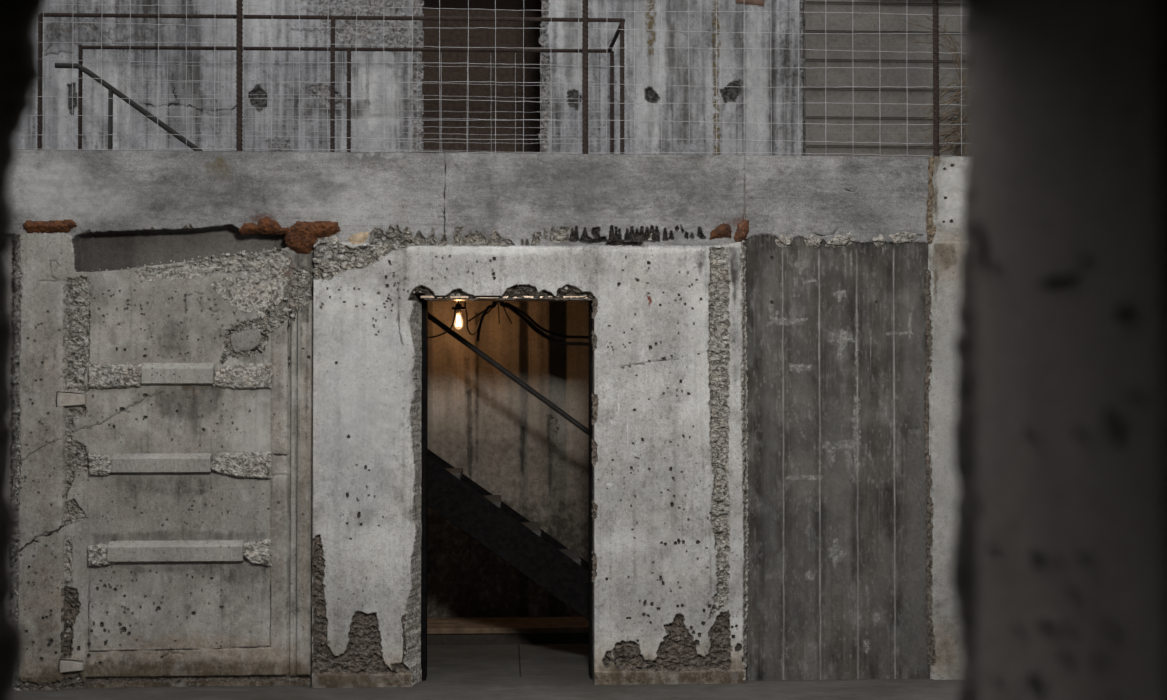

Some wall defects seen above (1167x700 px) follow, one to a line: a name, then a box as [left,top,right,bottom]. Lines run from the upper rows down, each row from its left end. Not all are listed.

spalling [248,84,267,111]
spalling [644,87,660,103]
spalling [720,79,742,103]
corrosion [22,220,77,233]
corrosion [239,216,341,254]
corrosion [709,220,749,242]
crack [19,392,164,463]
spalling [9,224,749,691]
crack [18,525,64,552]